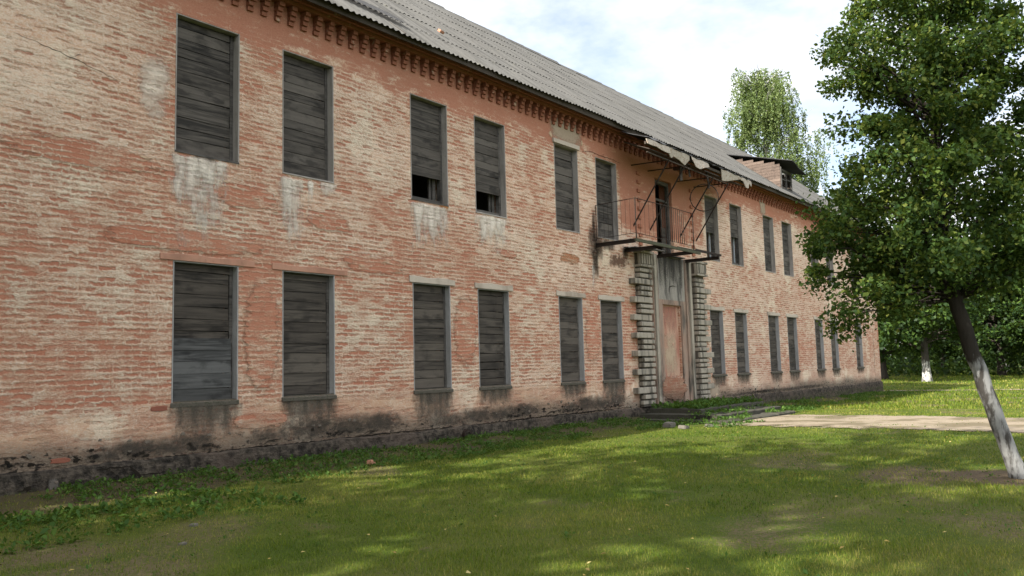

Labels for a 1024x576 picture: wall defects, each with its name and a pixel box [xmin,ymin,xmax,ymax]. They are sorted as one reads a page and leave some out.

damp [173,154,227,225]
damp [282,176,336,233]
damp [412,203,447,239]
damp [479,216,506,236]
damp [98,404,237,458]
damp [256,399,391,439]
damp [416,389,530,424]
damp [563,382,625,410]